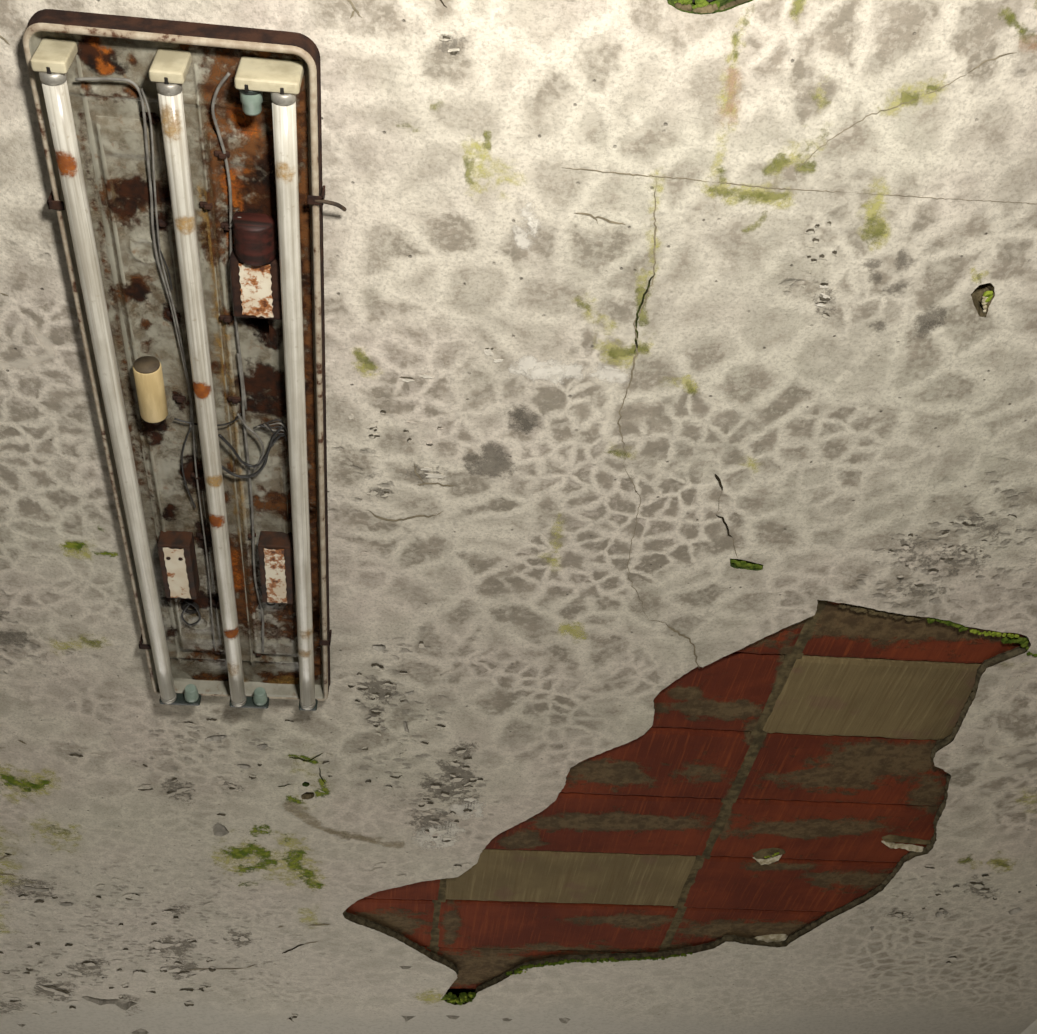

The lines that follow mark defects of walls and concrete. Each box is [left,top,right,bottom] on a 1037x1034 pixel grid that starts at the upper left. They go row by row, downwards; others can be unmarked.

crack [562,52,1034,667]
hole [971,283,995,317]
spalling [345,514,1037,1020]